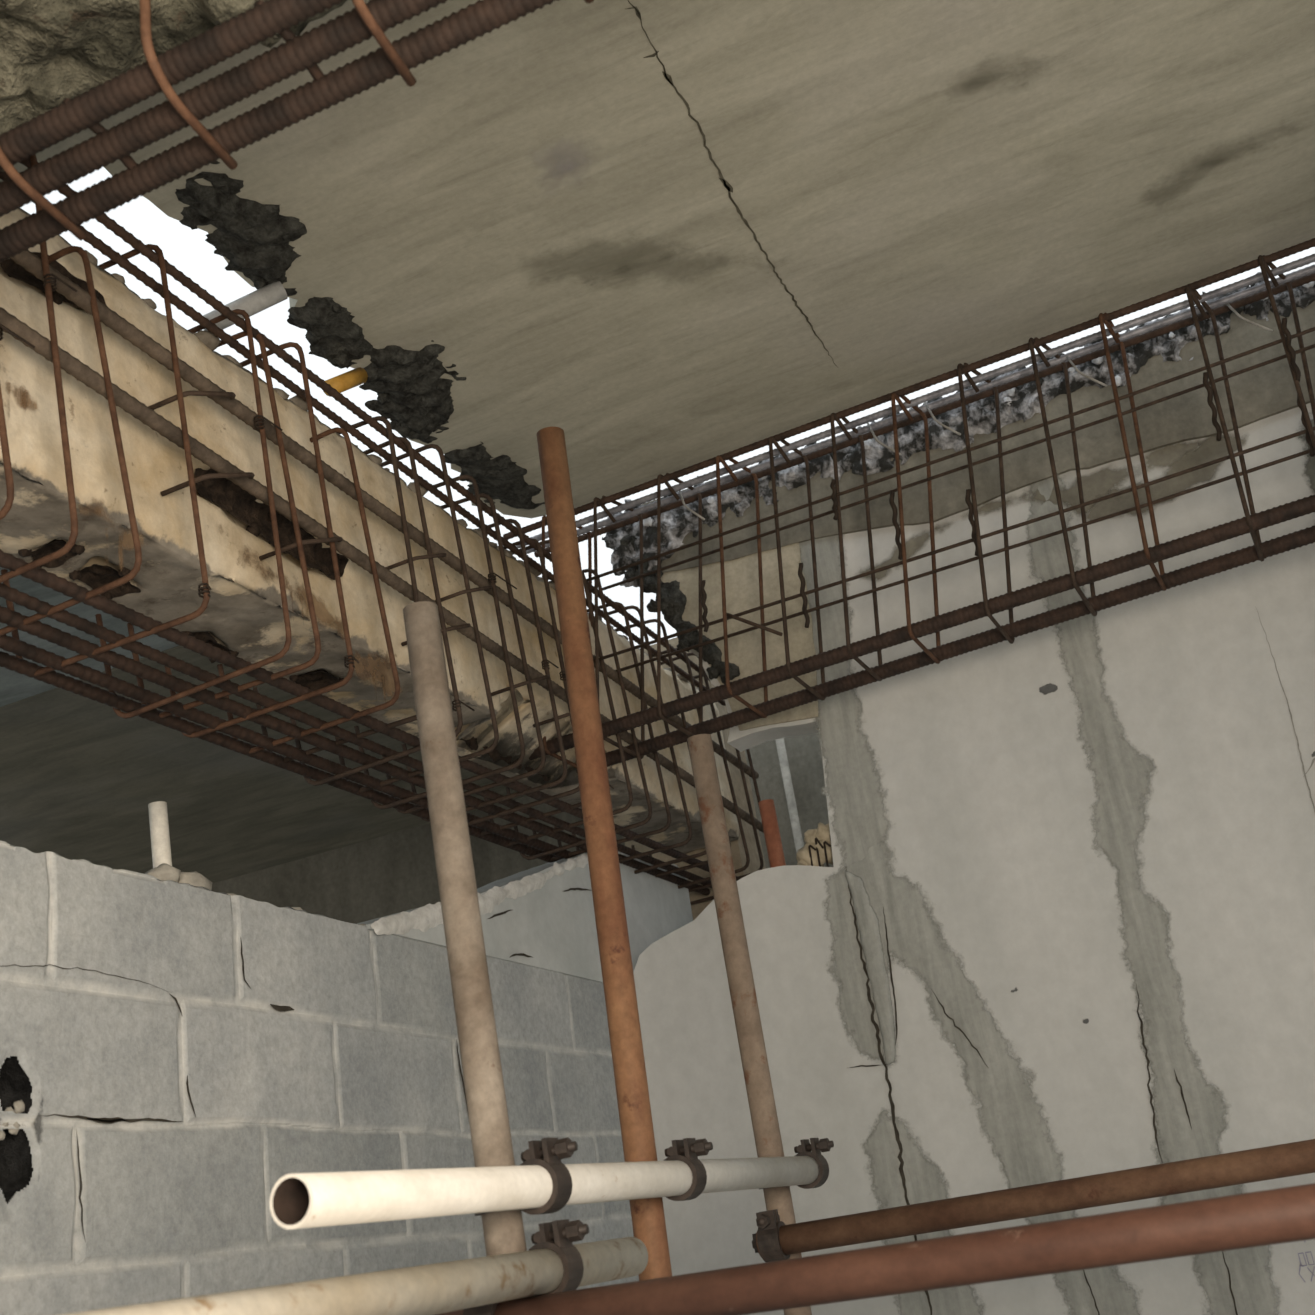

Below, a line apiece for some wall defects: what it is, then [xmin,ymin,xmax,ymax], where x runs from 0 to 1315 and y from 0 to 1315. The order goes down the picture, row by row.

crack [627,0,835,364]
spalling [175,161,467,444]
spalling [18,539,141,600]
spalling [195,468,349,580]
spalling [444,442,545,511]
spalling [602,272,1315,684]
crack [1255,606,1315,812]
crack [8,964,183,1017]
crack [846,869,917,1241]
crack [931,989,988,1067]
spalling [0,1056,33,1204]
crack [924,1290,932,1315]